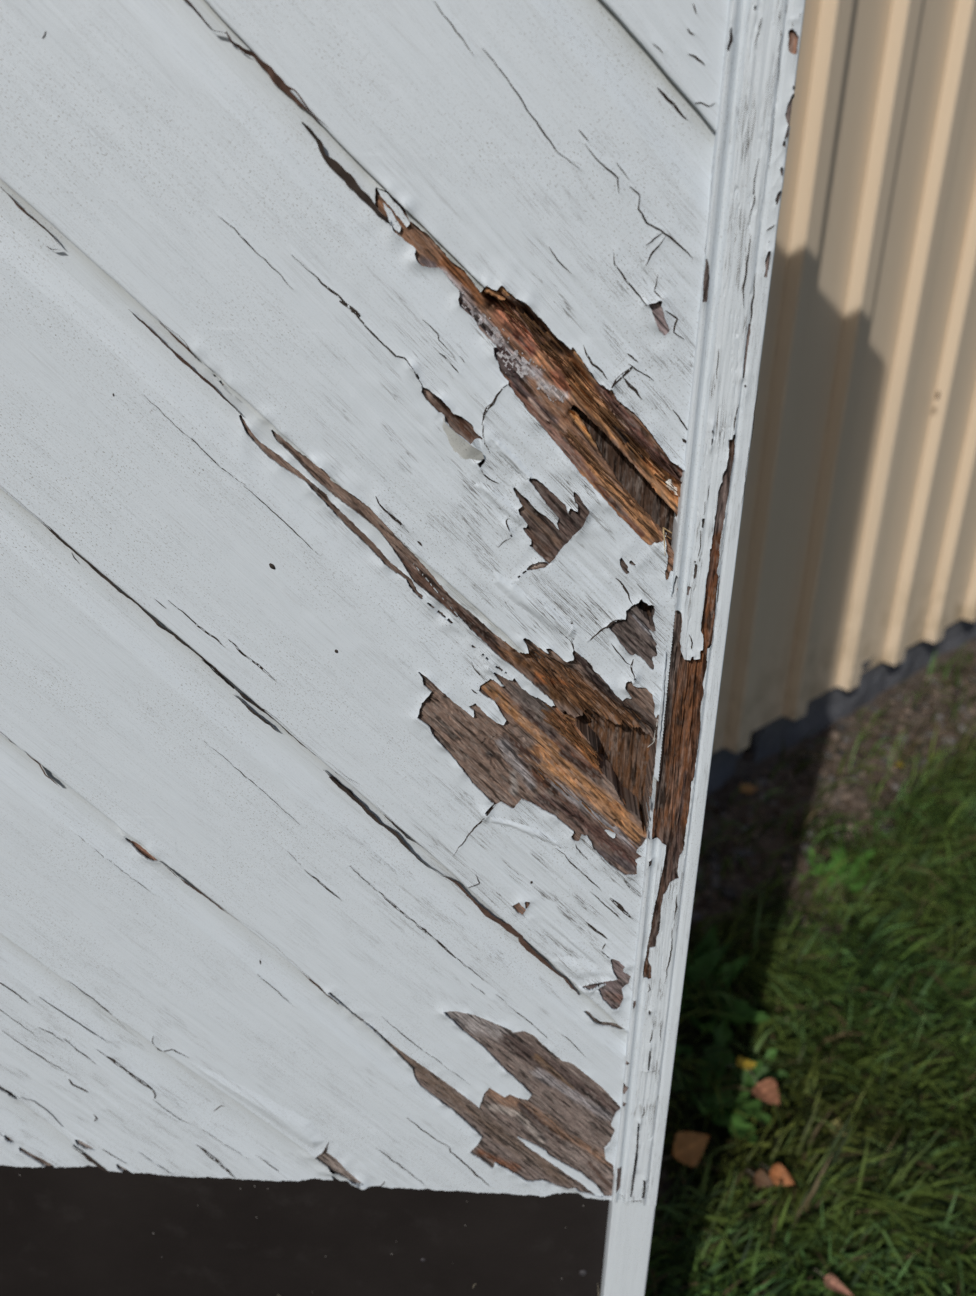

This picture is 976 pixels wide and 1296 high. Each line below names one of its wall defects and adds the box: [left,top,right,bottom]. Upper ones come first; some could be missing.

crack [653,4,705,65]
crack [657,87,715,120]
crack [434,1,691,338]
peeling [649,300,670,335]
crack [583,345,653,399]
peeling [416,374,484,461]
spalling [239,415,659,875]
peeling [330,992,646,1198]